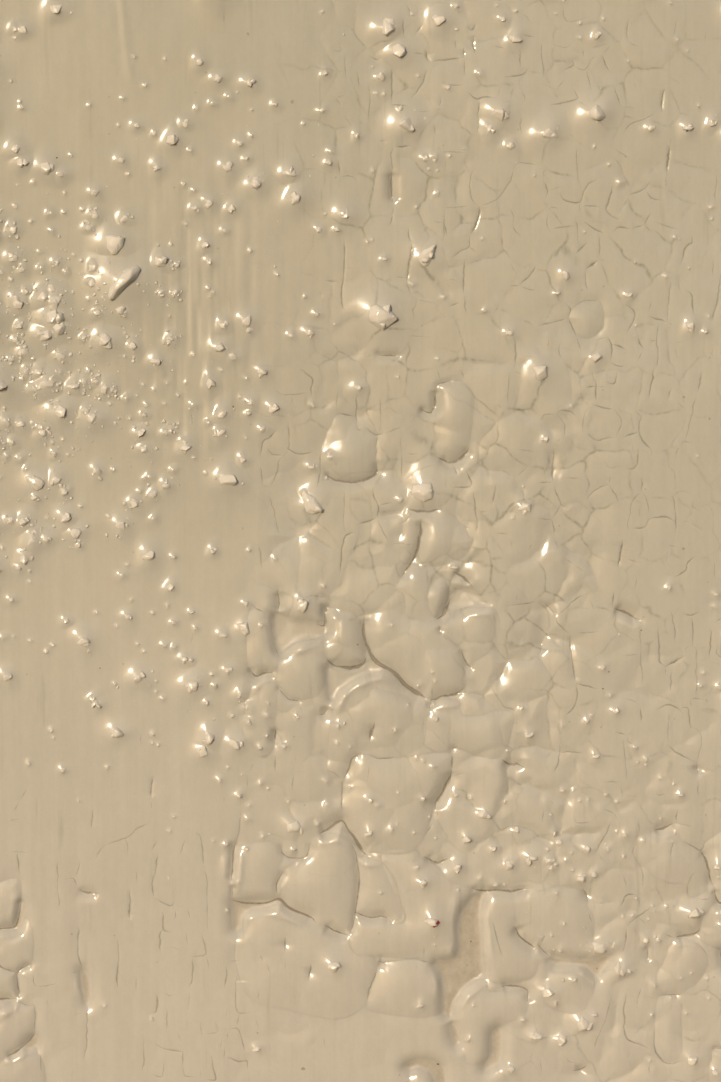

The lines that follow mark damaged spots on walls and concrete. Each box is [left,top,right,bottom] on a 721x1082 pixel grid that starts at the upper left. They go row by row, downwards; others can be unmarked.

crack [406,525,422,569]
crack [341,623,458,700]
crack [326,820,365,854]
crack [236,883,339,933]